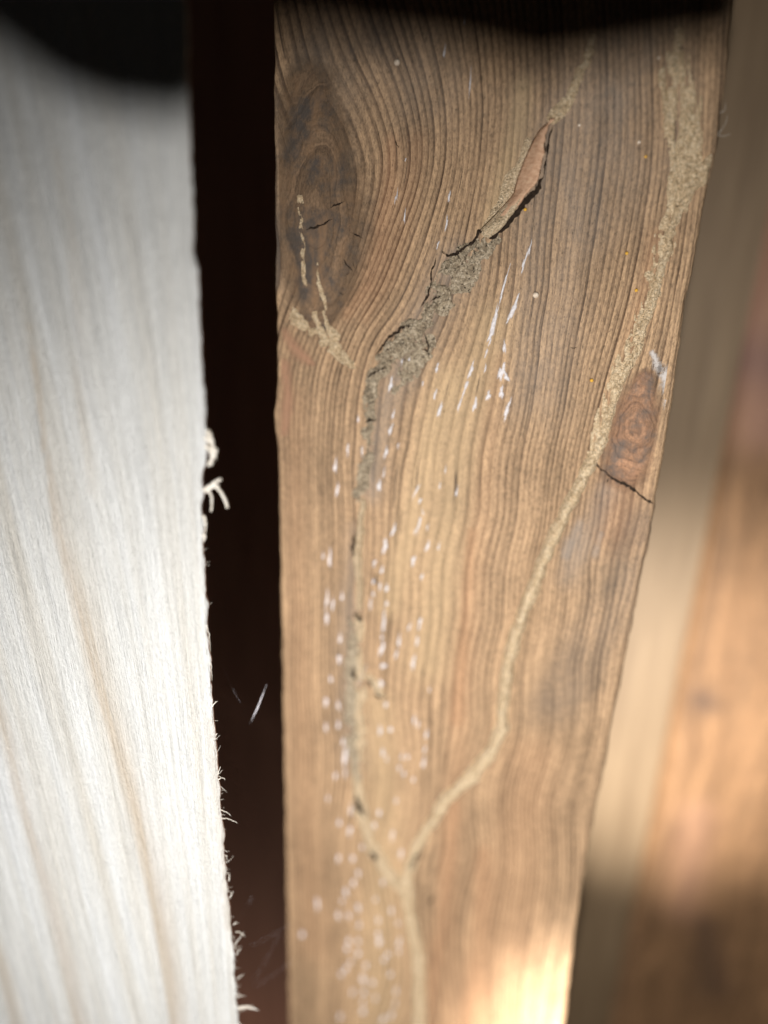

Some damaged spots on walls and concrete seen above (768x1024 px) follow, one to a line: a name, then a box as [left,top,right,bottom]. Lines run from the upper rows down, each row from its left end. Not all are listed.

crack [366,230,482,378]
crack [596,463,653,504]